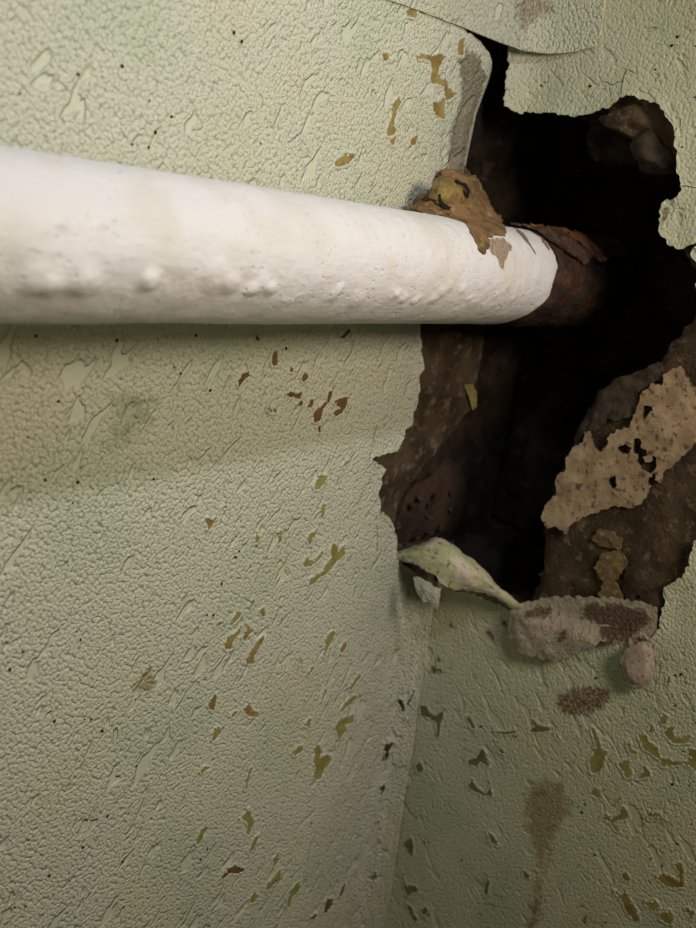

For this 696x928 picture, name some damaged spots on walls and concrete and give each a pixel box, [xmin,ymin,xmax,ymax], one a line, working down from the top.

peeling [384,94,419,149]
rust [489,237,512,269]
peeling [267,347,349,436]
spalling [394,29,696,689]
peeling [300,472,347,588]
peeling [212,596,268,667]
peeling [289,671,362,782]
peeling [395,688,446,739]
peeling [465,716,564,799]
peeling [586,711,696,835]
peeling [219,806,261,882]
peeling [654,860,696,891]